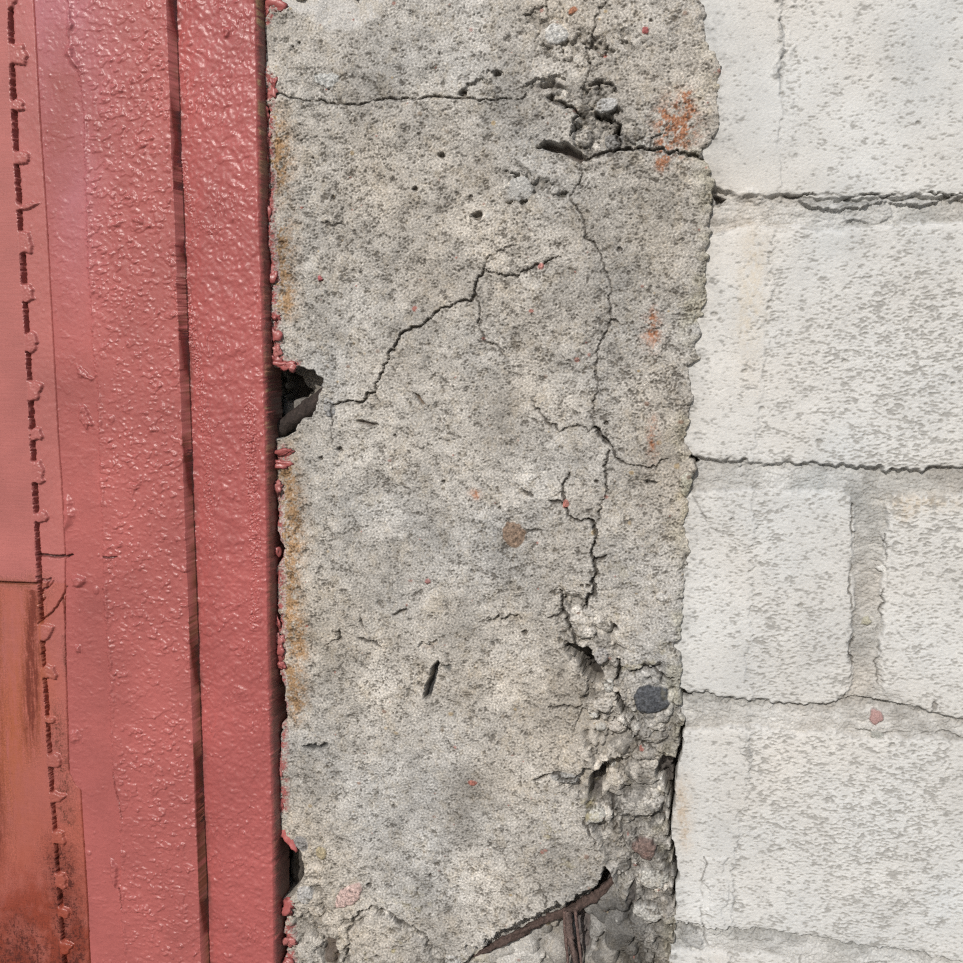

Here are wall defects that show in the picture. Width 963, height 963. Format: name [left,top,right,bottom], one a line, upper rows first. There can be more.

corrosion [642,76,712,177]
crack [278,0,703,645]
spalling [277,388,322,437]
crack [691,494,725,546]
crack [357,637,383,649]
spalling [488,613,521,626]
crack [628,664,676,681]
corrosion [0,565,91,963]
spalling [577,756,624,808]
spalling [465,868,634,963]